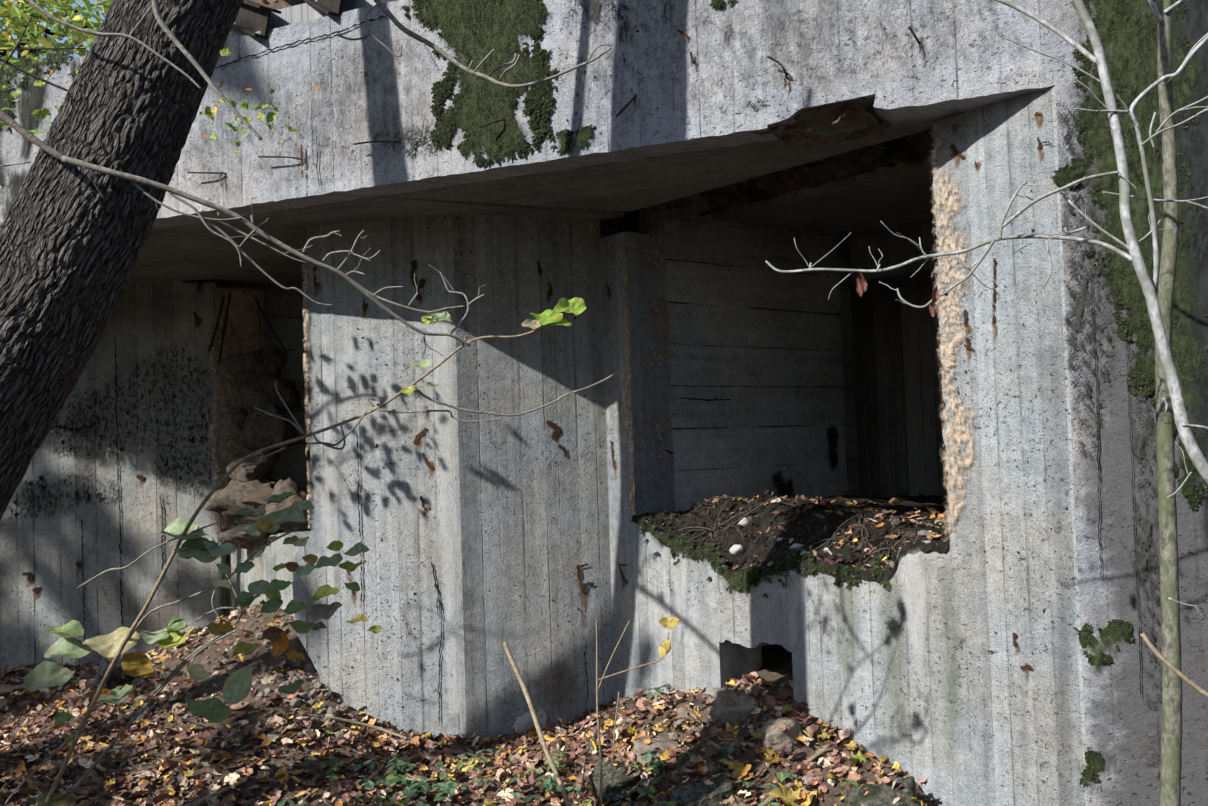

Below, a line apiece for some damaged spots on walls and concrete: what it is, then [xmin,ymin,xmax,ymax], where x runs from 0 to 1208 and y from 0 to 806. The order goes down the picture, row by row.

spalling [753,97,891,149]
corrosion [950,124,980,169]
corrosion [1034,112,1043,159]
spalling [931,135,991,533]
corrosion [413,428,434,476]
corrosion [546,420,567,464]
corrosion [576,564,594,626]
crack [431,563,443,725]